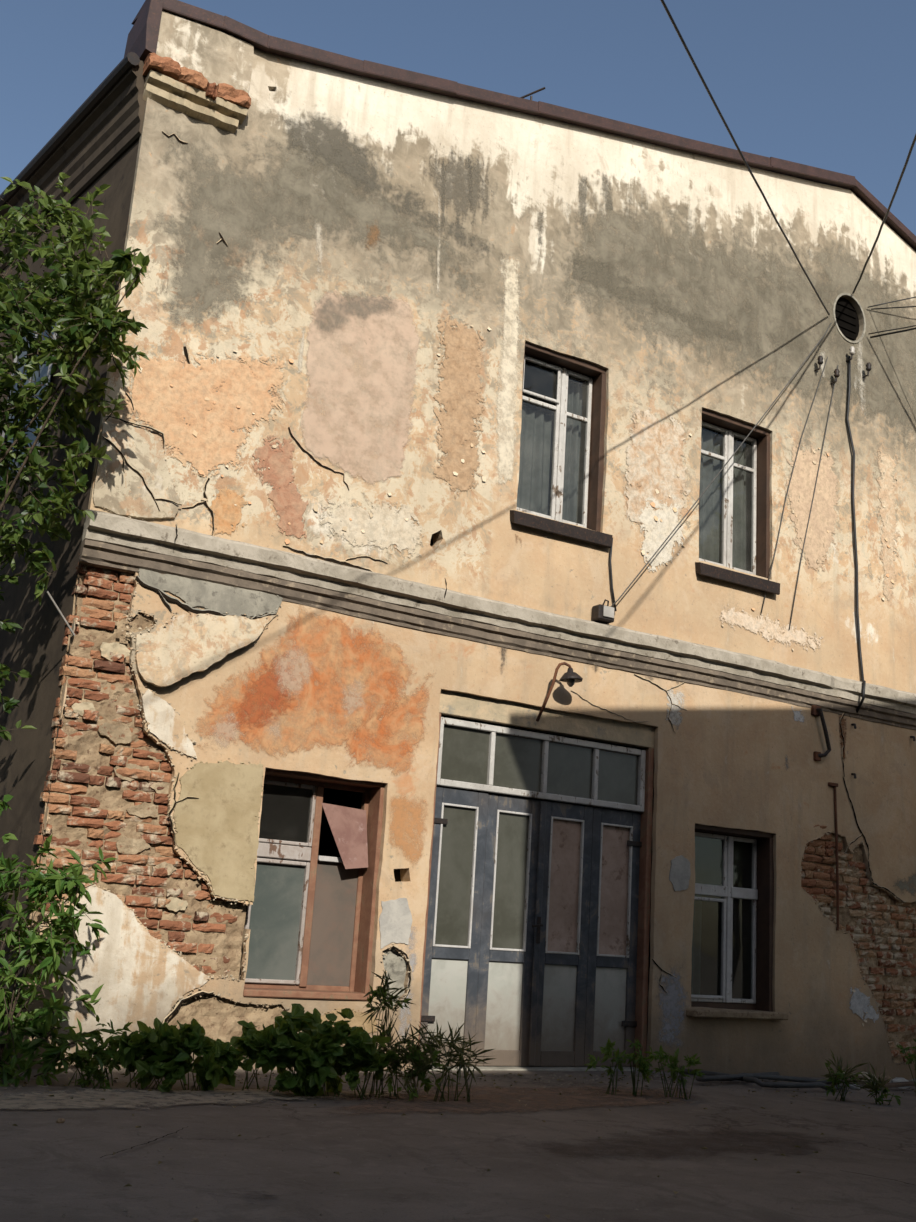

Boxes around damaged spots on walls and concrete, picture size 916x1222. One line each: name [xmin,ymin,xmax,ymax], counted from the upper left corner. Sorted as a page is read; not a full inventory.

crack [102,392,215,540]
peeling [118,350,433,558]
crack [288,427,349,489]
damp [155,117,489,325]
damp [298,291,419,483]
peeling [433,315,492,498]
damp [496,259,520,484]
peeling [623,407,692,572]
damp [566,175,916,447]
peeling [719,604,823,654]
flaking render [26,554,290,1046]
flaking render [800,825,916,1065]